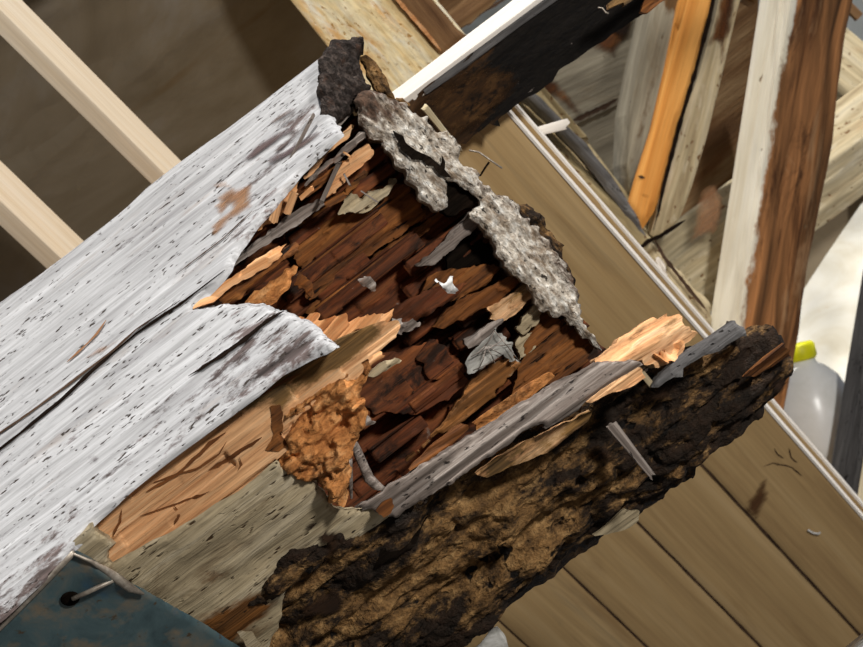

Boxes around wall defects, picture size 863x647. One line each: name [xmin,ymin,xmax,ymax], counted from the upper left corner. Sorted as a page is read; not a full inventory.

crack [178,211,252,273]
crack [0,270,224,450]
crack [188,311,284,376]
crack [260,373,301,396]
spalling [266,405,287,451]
crack [113,432,262,536]
peeling [376,498,394,518]
leakage [750,484,766,514]